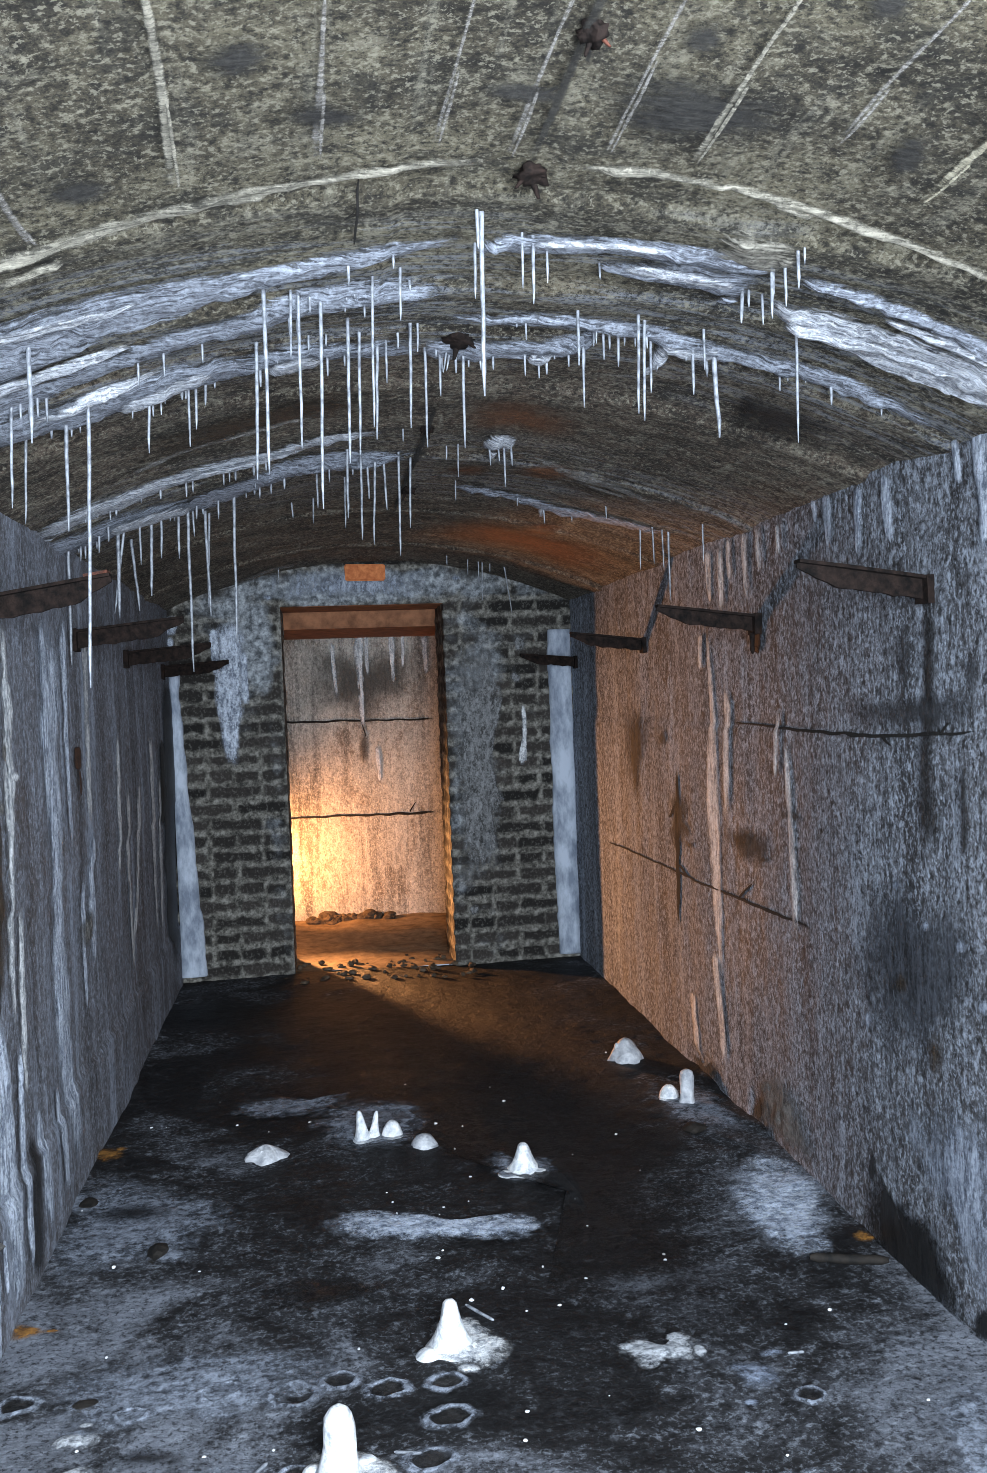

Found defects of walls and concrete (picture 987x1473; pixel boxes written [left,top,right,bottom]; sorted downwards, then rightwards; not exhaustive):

damp [0,265,61,288]
damp [536,241,734,290]
damp [0,348,127,398]
damp [0,304,134,346]
damp [35,371,210,424]
damp [784,324,958,381]
damp [887,322,987,367]
damp [161,402,340,455]
damp [705,526,779,608]
damp [209,625,249,760]
crack [736,722,974,746]
crack [611,774,809,928]